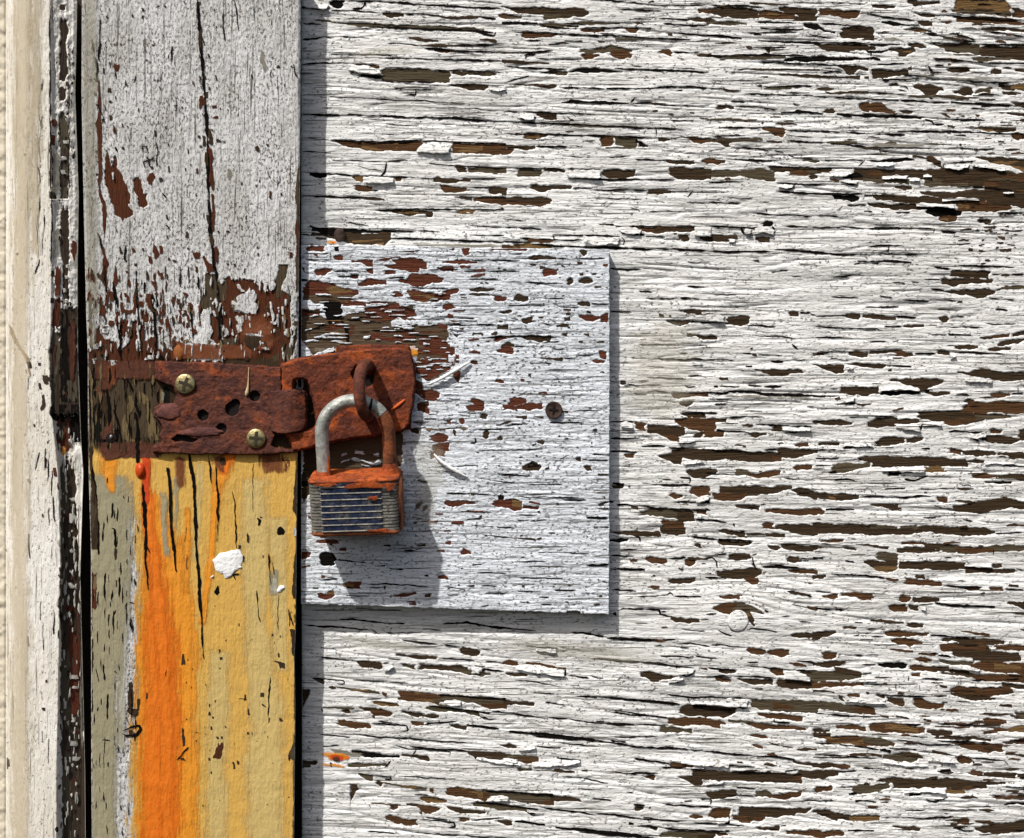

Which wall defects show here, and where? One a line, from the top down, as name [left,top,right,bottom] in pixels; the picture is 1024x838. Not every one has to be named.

peeling [334,105,811,214]
peeling [647,0,1024,303]
rust [95,360,155,396]
crack [28,0,255,836]
peeling [26,0,644,838]
peeling [659,309,750,340]
peeling [845,314,924,328]
peeling [937,331,1024,359]
peeling [603,350,1024,838]